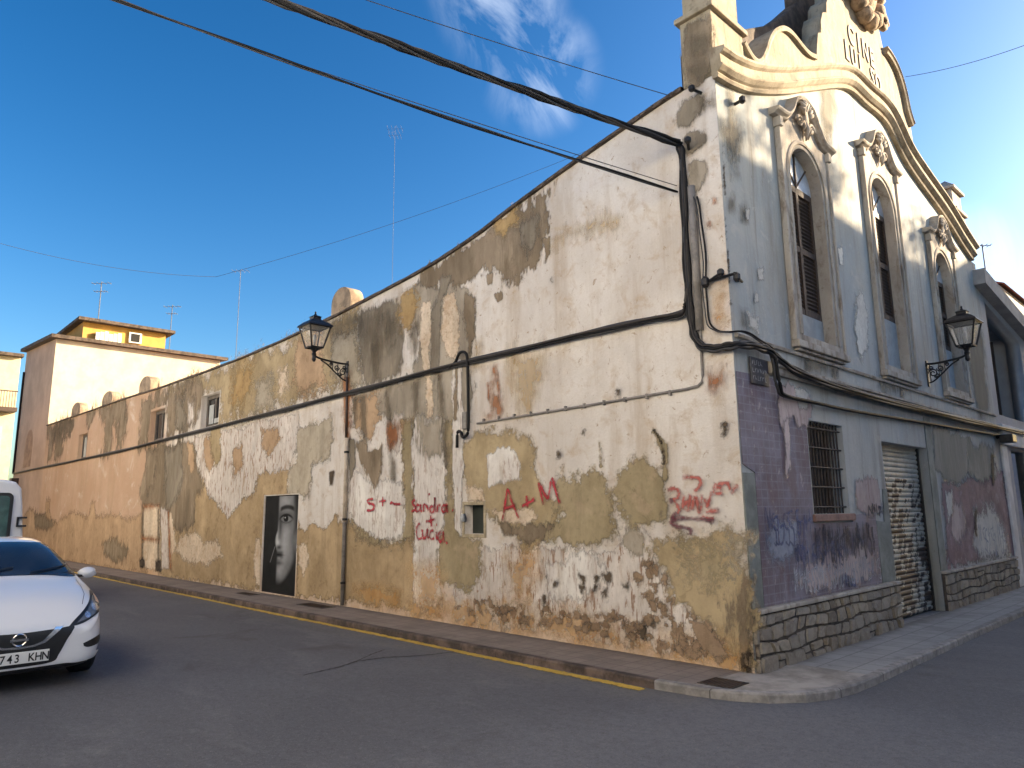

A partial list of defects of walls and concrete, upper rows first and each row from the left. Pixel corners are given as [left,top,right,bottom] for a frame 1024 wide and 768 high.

flaking render [417,182,555,302]
peeling [853,290,869,360]
water stain [46,380,205,571]
flaking render [22,306,365,591]
flaking render [278,415,415,611]
corrosion [487,366,503,418]
peeling [453,425,730,664]
peeling [778,381,812,475]
peeling [945,490,1009,560]